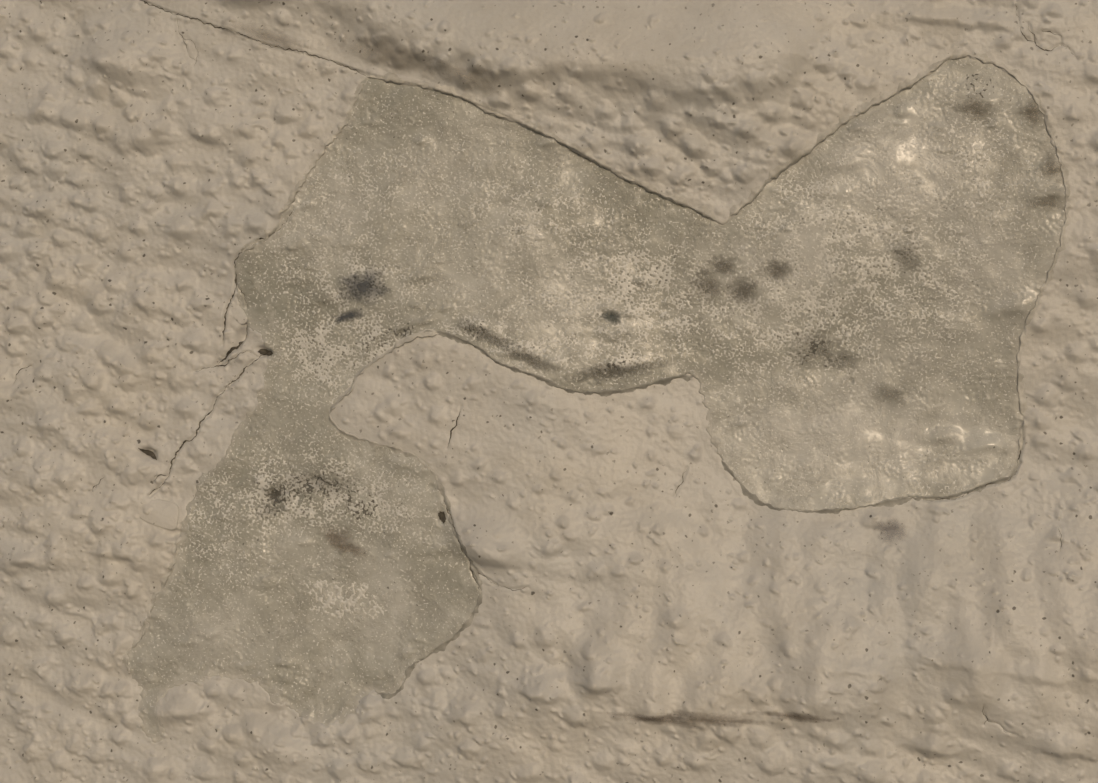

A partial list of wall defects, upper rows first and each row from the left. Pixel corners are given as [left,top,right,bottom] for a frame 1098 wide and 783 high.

peeling [122,50,1071,743]